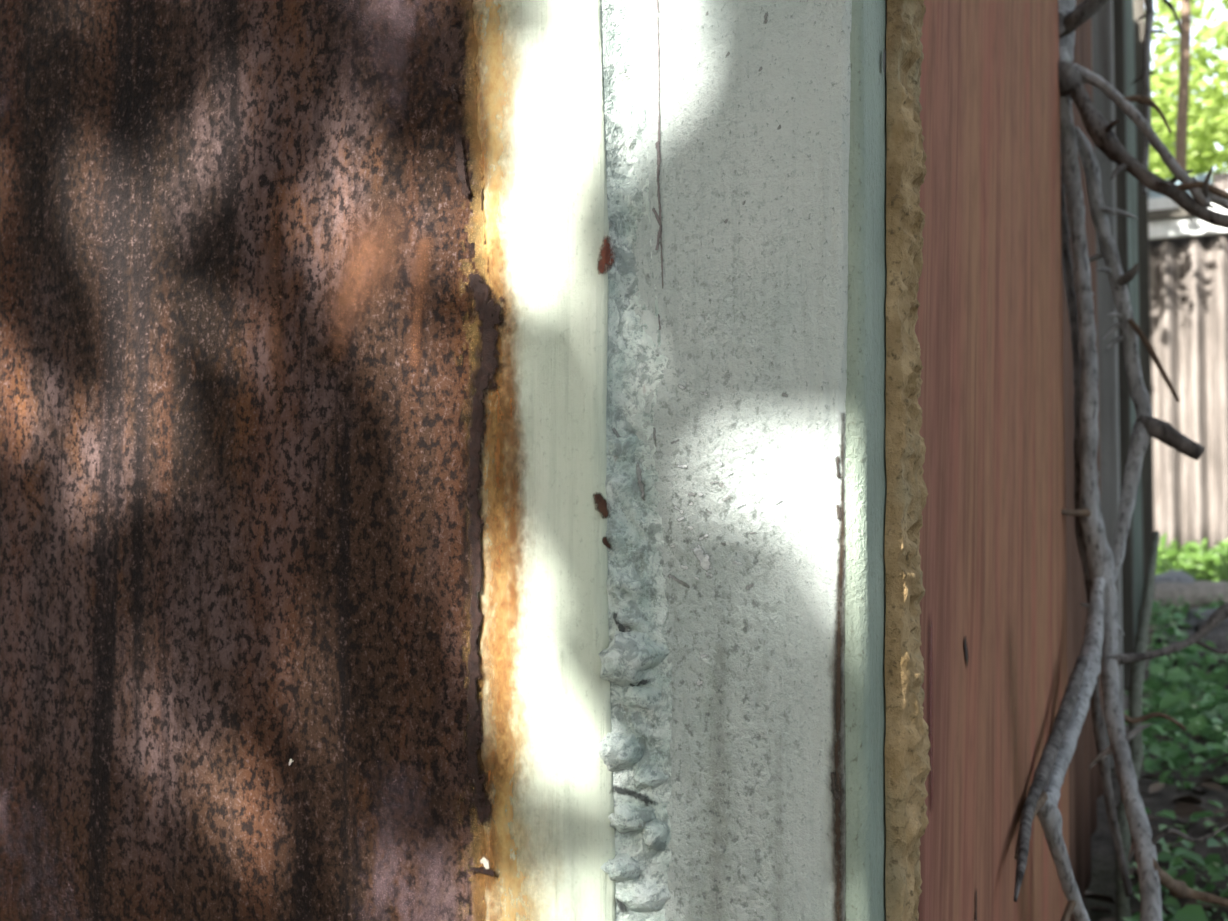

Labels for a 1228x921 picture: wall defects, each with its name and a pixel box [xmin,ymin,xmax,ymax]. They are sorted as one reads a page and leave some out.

corrosion [598,236,614,274]
corrosion [453,0,535,921]
corrosion [593,493,610,519]
corrosion [374,775,450,921]